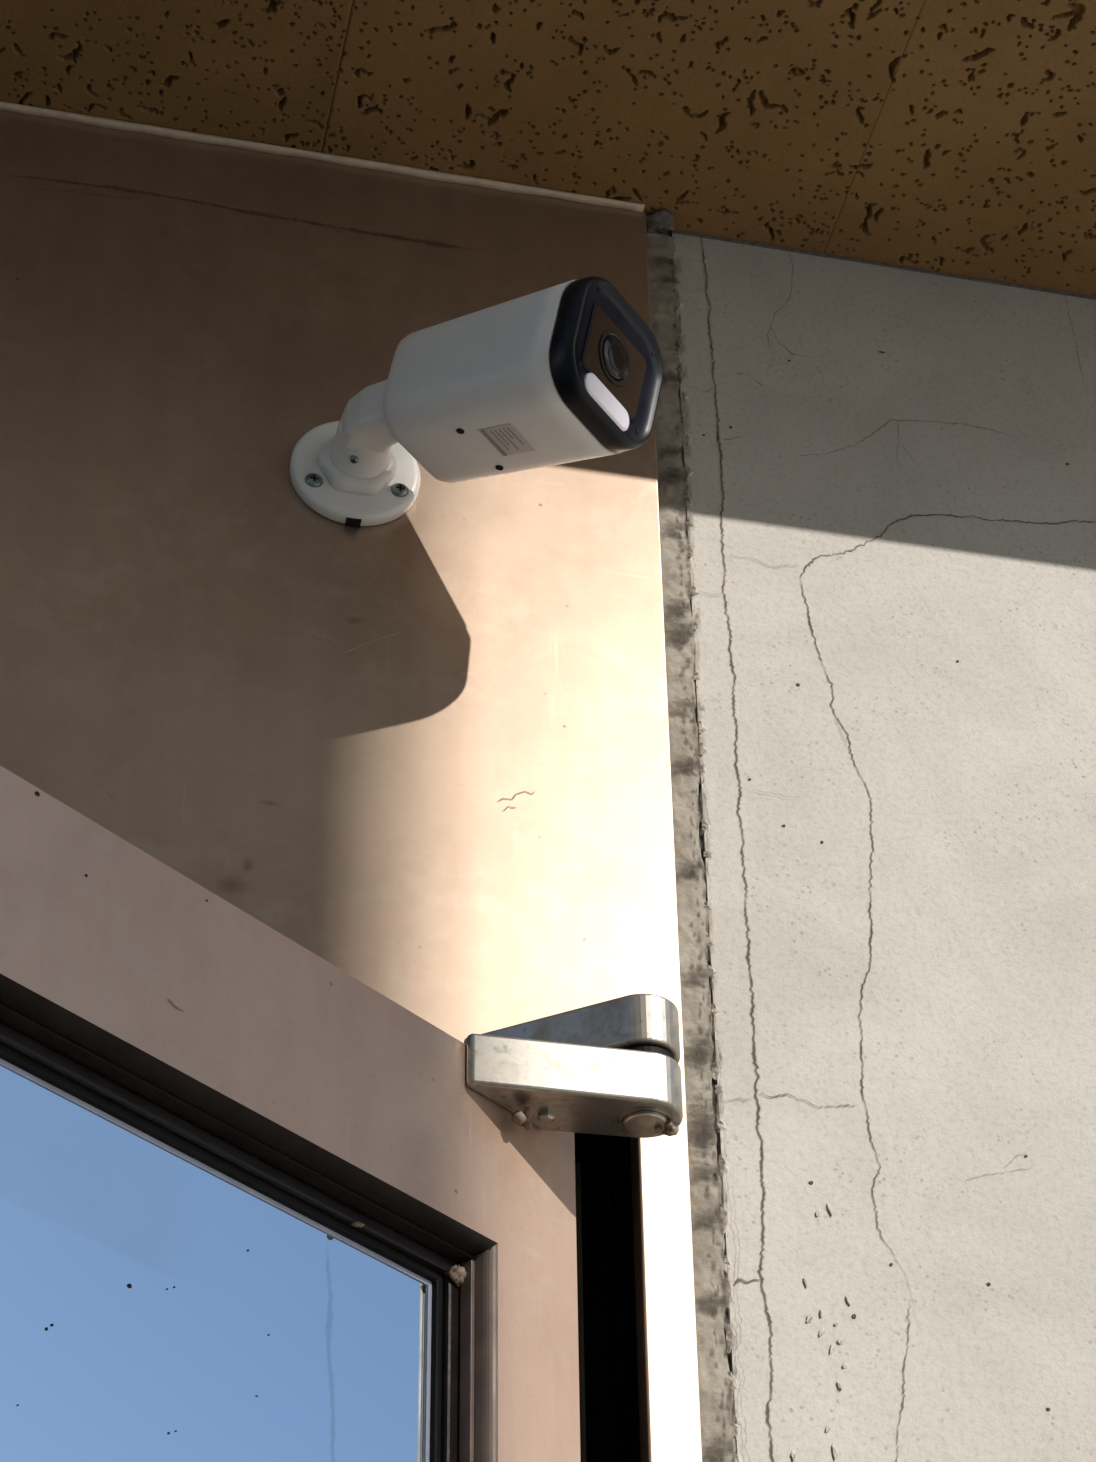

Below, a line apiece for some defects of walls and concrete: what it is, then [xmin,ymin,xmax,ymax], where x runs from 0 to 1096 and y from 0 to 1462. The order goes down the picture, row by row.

crack [700,237,1095,1462]